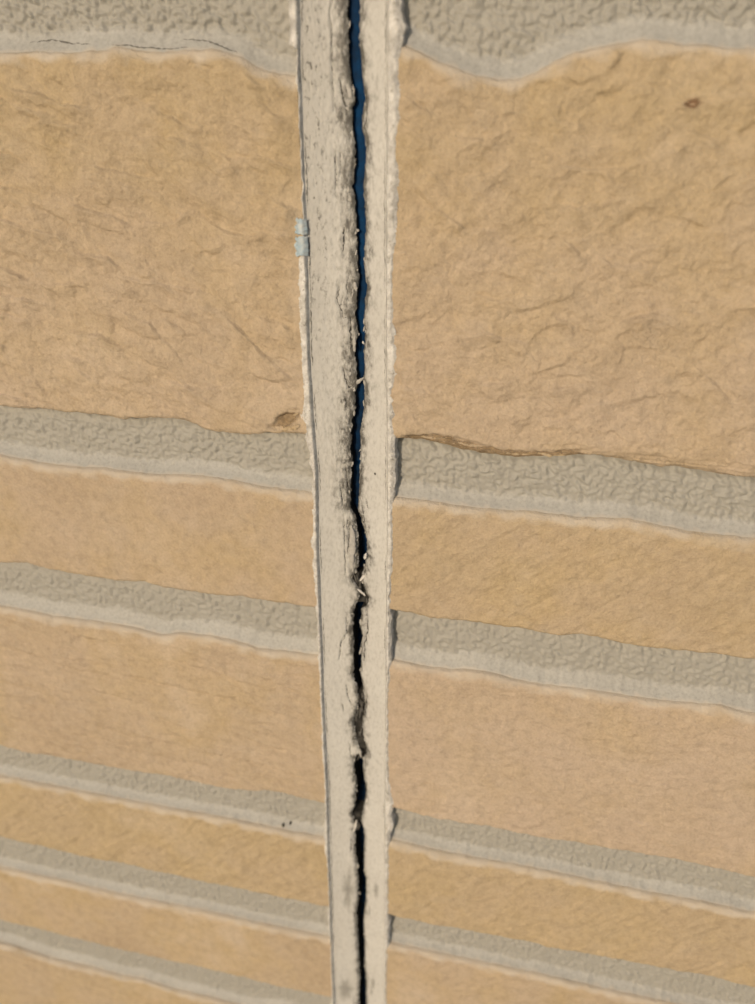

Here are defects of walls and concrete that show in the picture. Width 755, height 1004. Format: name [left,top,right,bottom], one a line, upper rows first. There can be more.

crack [306,237,314,366]
crack [314,0,386,1004]